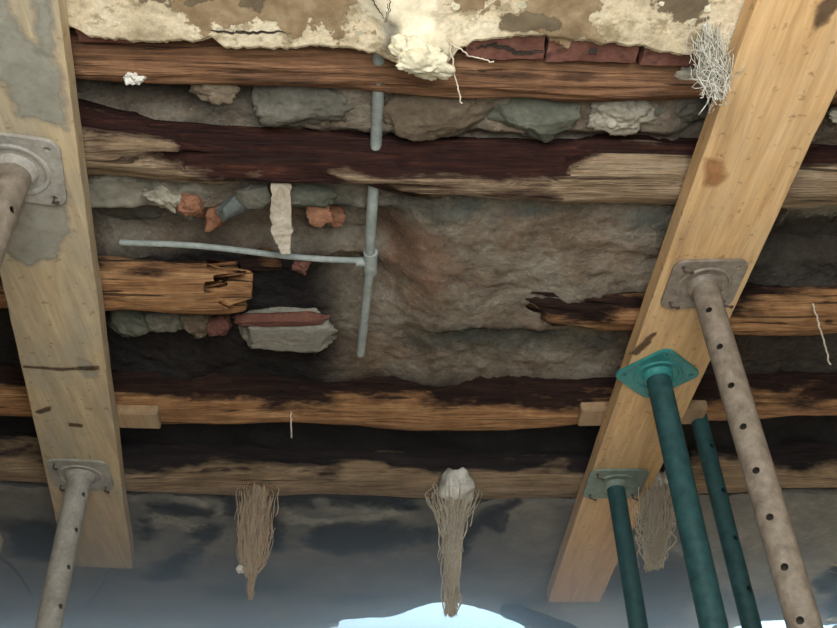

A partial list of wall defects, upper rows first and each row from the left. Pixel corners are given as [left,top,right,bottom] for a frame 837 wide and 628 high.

crack [372,0,391,23]
crack [207,28,291,36]